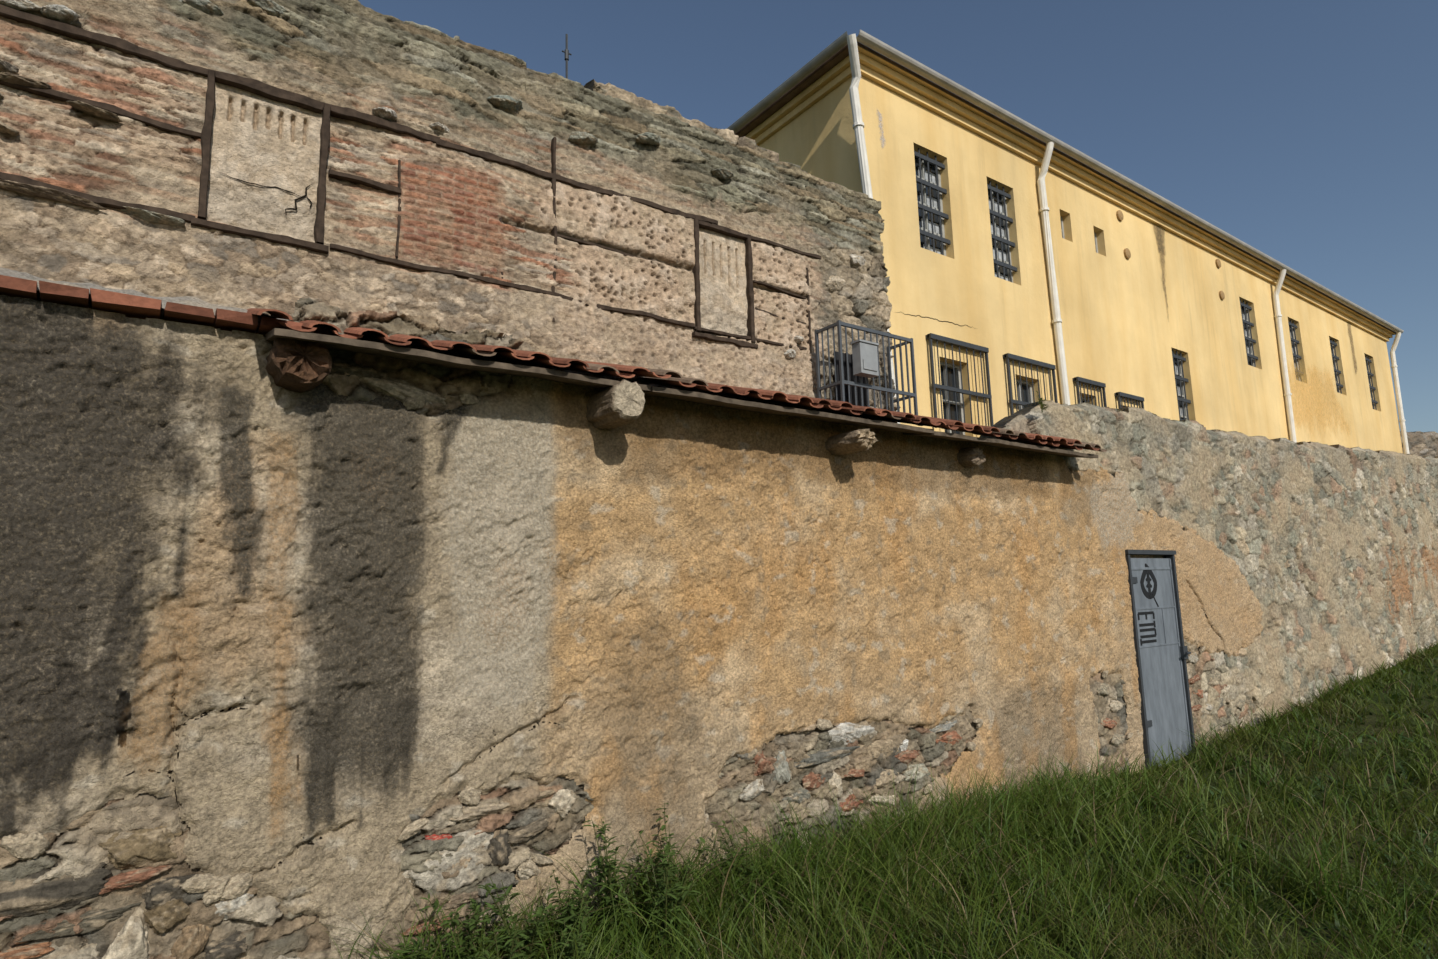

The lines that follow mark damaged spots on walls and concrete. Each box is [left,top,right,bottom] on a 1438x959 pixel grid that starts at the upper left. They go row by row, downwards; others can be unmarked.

spalling [705,706,983,857]
spalling [1089,670,1133,777]
spalling [1184,639,1259,750]
spalling [0,793,350,959]
spalling [374,776,594,955]